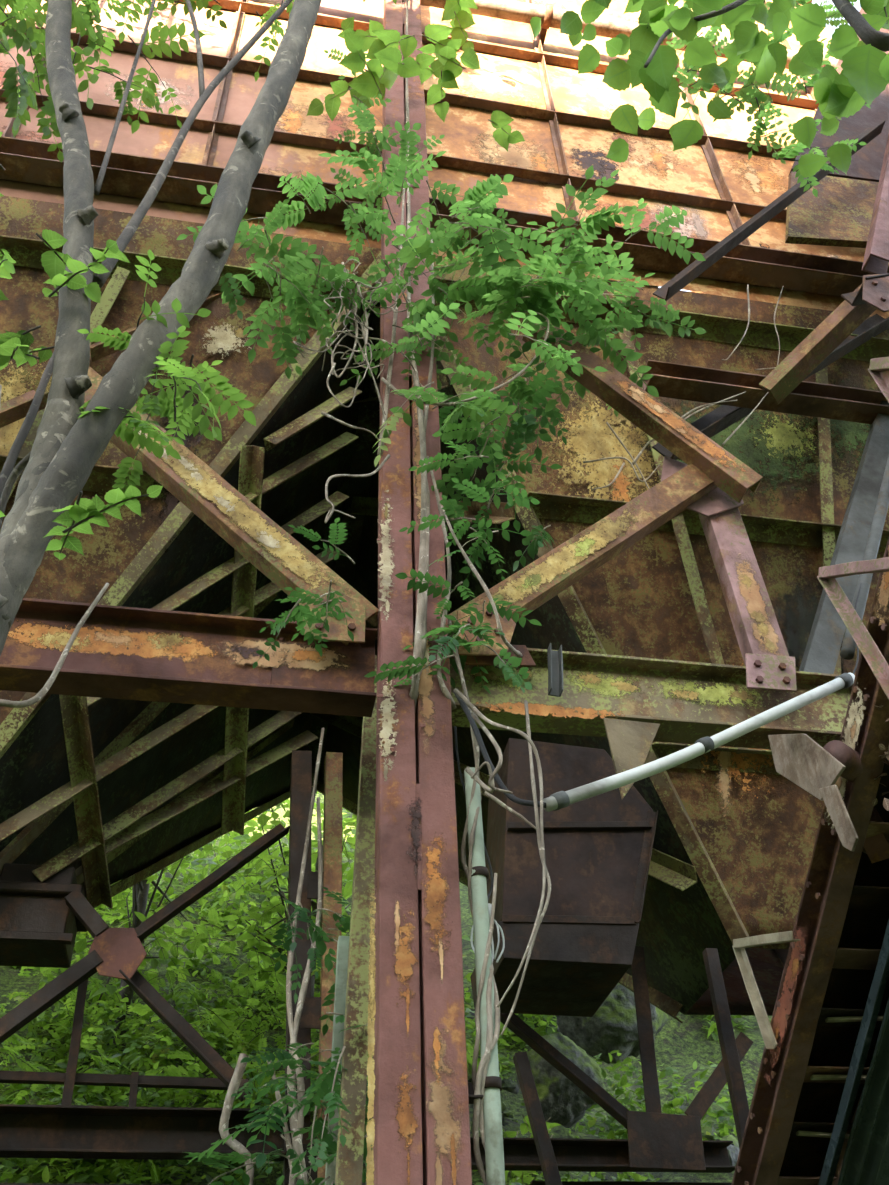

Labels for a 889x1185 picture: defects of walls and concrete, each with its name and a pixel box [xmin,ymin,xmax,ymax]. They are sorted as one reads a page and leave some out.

corrosion [458,84,542,121]
corrosion [472,108,684,187]
corrosion [586,202,696,238]
corrosion [7,619,350,671]
corrosion [735,554,785,656]
corrosion [875,572,889,625]
corrosion [476,702,625,719]
corrosion [690,746,778,829]
corrosion [392,797,452,1034]
corrosion [366,856,376,1185]
corrosion [764,925,806,1084]
corrosion [395,1027,463,1185]